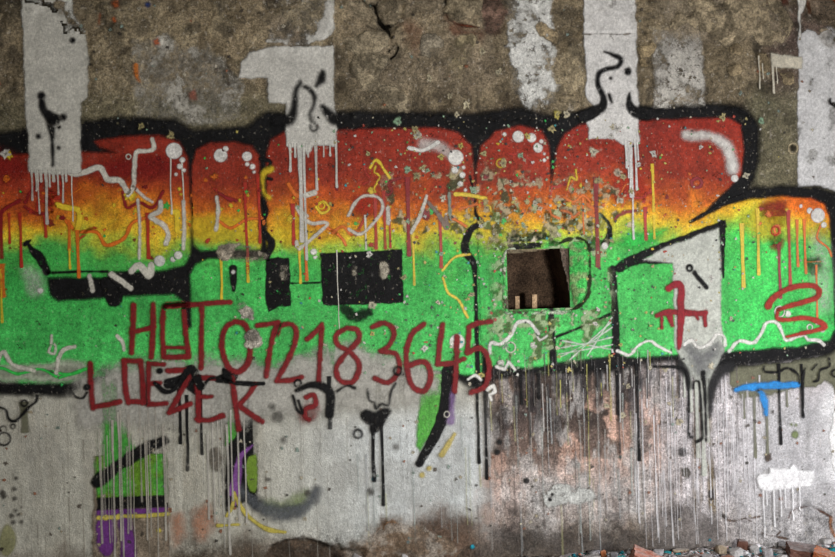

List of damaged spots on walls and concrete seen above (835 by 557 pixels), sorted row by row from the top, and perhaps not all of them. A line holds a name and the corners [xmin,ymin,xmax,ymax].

crack [362,0,399,60]
peeling [431,170,465,191]
peeling [392,210,416,232]
spalling [447,171,626,364]
damp [412,501,728,557]